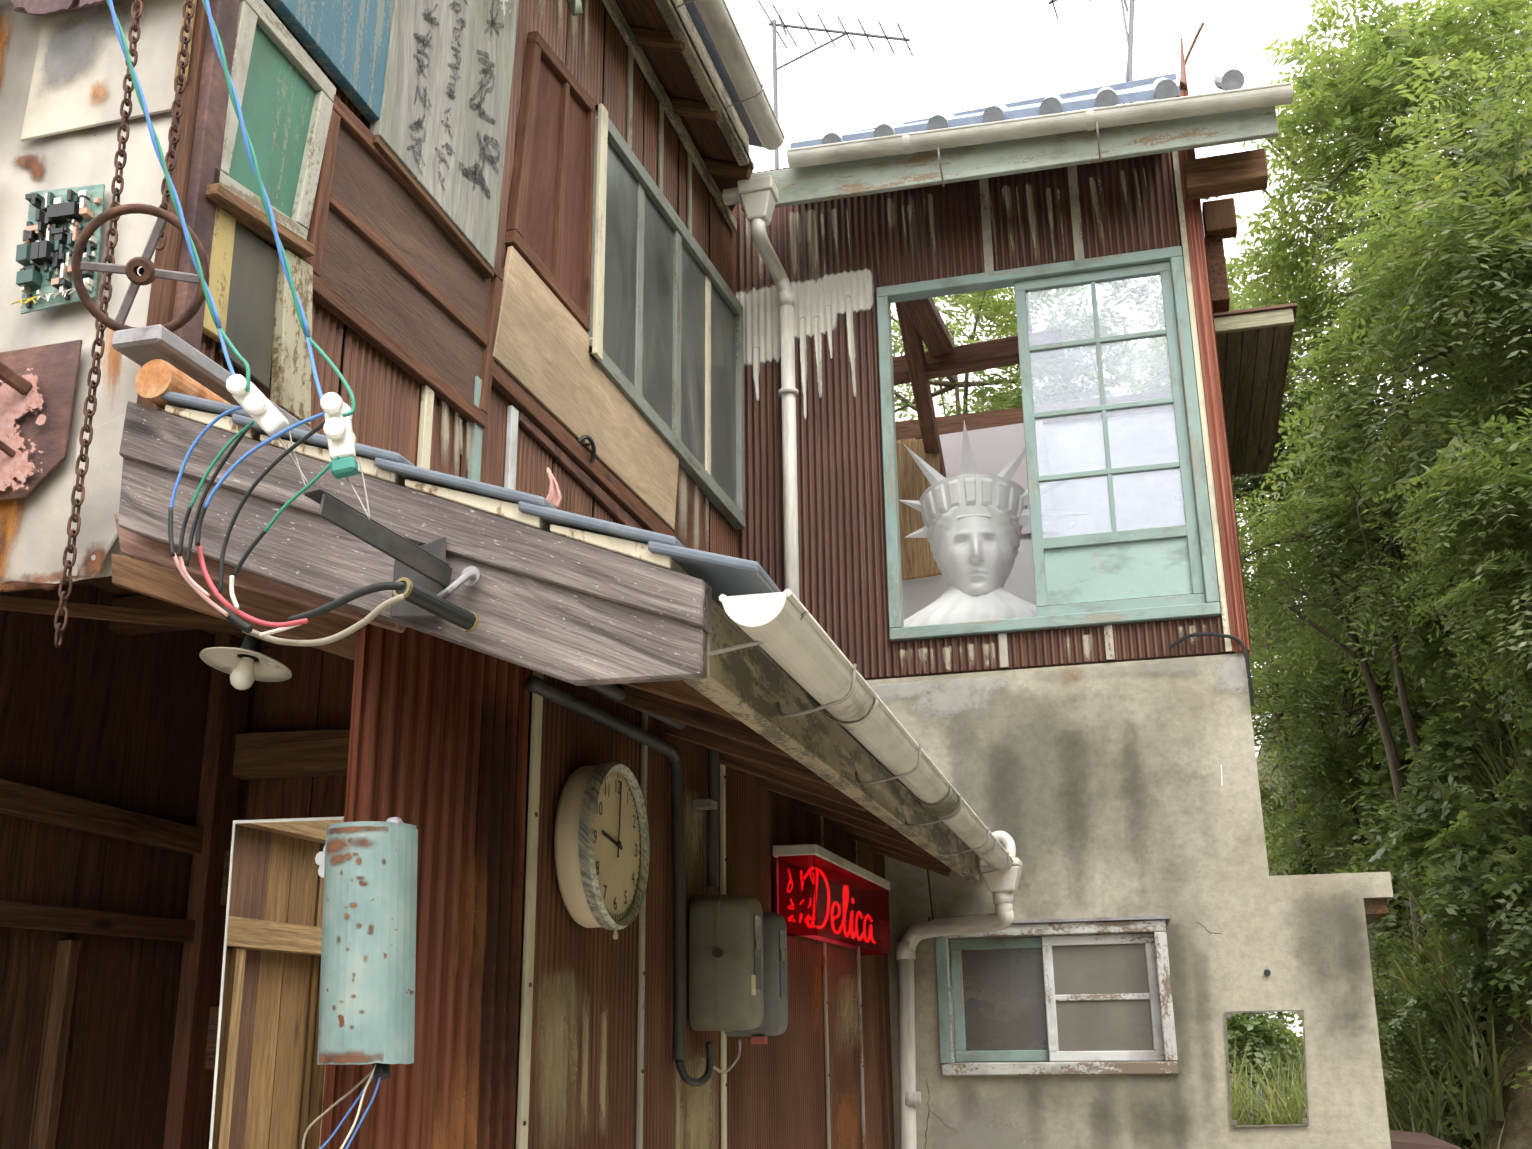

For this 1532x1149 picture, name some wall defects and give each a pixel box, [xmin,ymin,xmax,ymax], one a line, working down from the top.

rust [0,12,10,81]
peeling [0,367,46,491]
rust [0,499,105,590]
rust [327,826,386,885]
rust [319,1052,380,1063]